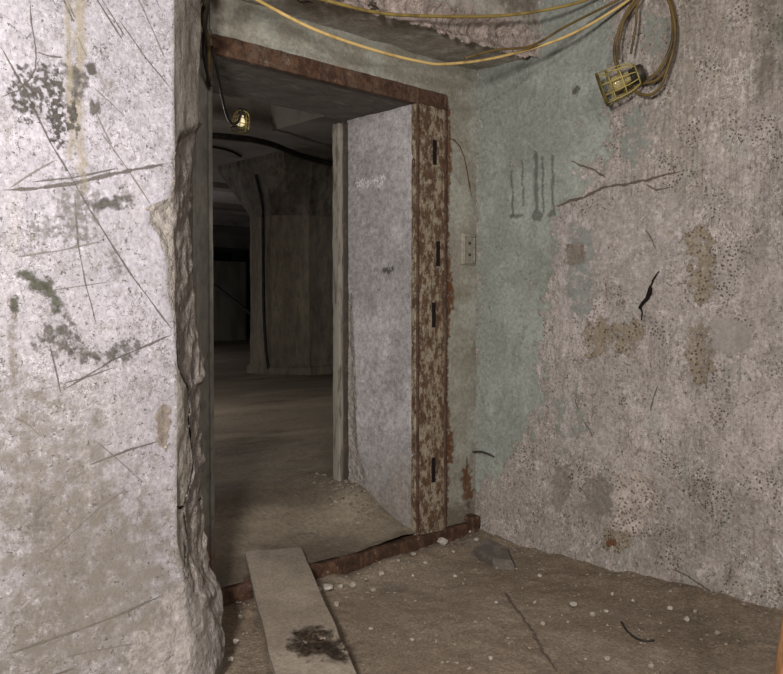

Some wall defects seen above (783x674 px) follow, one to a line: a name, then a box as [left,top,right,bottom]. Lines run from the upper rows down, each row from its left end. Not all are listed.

damp [50,90,78,147]
crack [555,161,678,207]
peeling [326,0,717,511]
crack [638,271,660,320]
spalling [581,469,661,554]